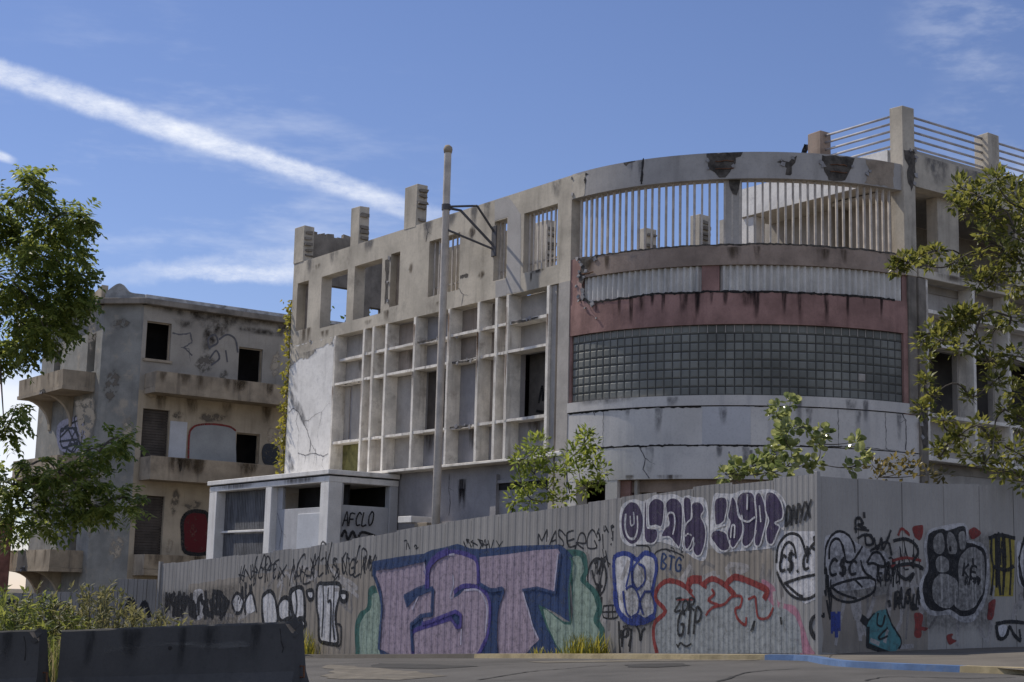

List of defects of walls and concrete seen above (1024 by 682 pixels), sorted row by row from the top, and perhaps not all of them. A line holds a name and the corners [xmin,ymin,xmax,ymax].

spalling [706,152,743,195]
spalling [778,156,797,175]
spalling [819,148,919,191]
spalling [575,255,598,307]
crack [290,403,330,467]
crack [598,444,766,478]